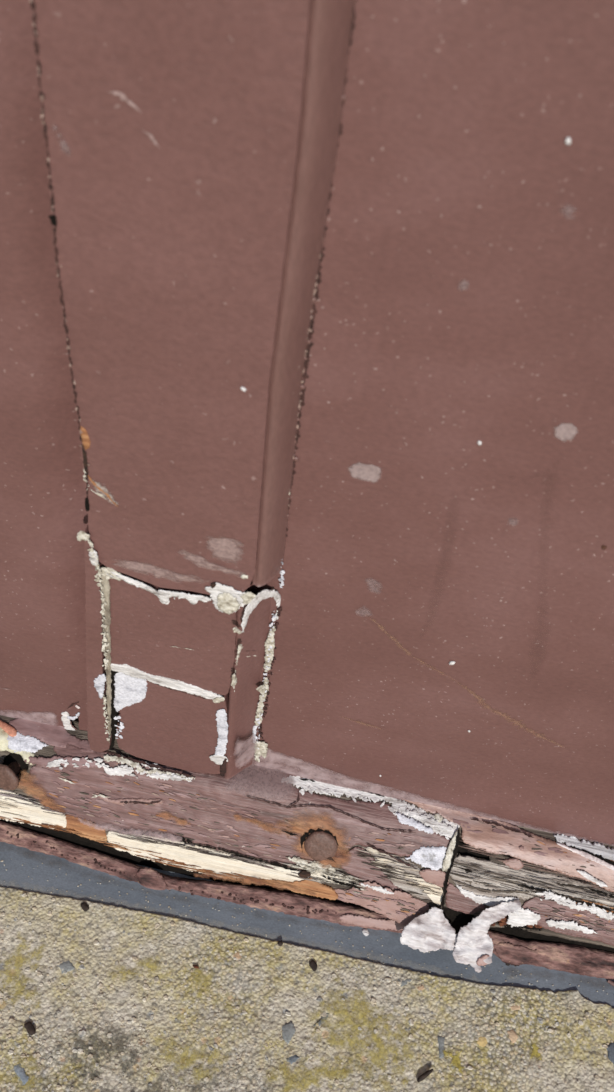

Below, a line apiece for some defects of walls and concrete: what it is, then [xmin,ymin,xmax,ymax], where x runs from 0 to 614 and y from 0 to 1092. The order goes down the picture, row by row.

crack [110,664,225,712]
peeling [0,531,336,875]
crack [116,792,416,891]
rust [234,815,351,867]
peeling [287,775,614,892]
crack [441,829,460,909]
peeling [338,881,614,973]